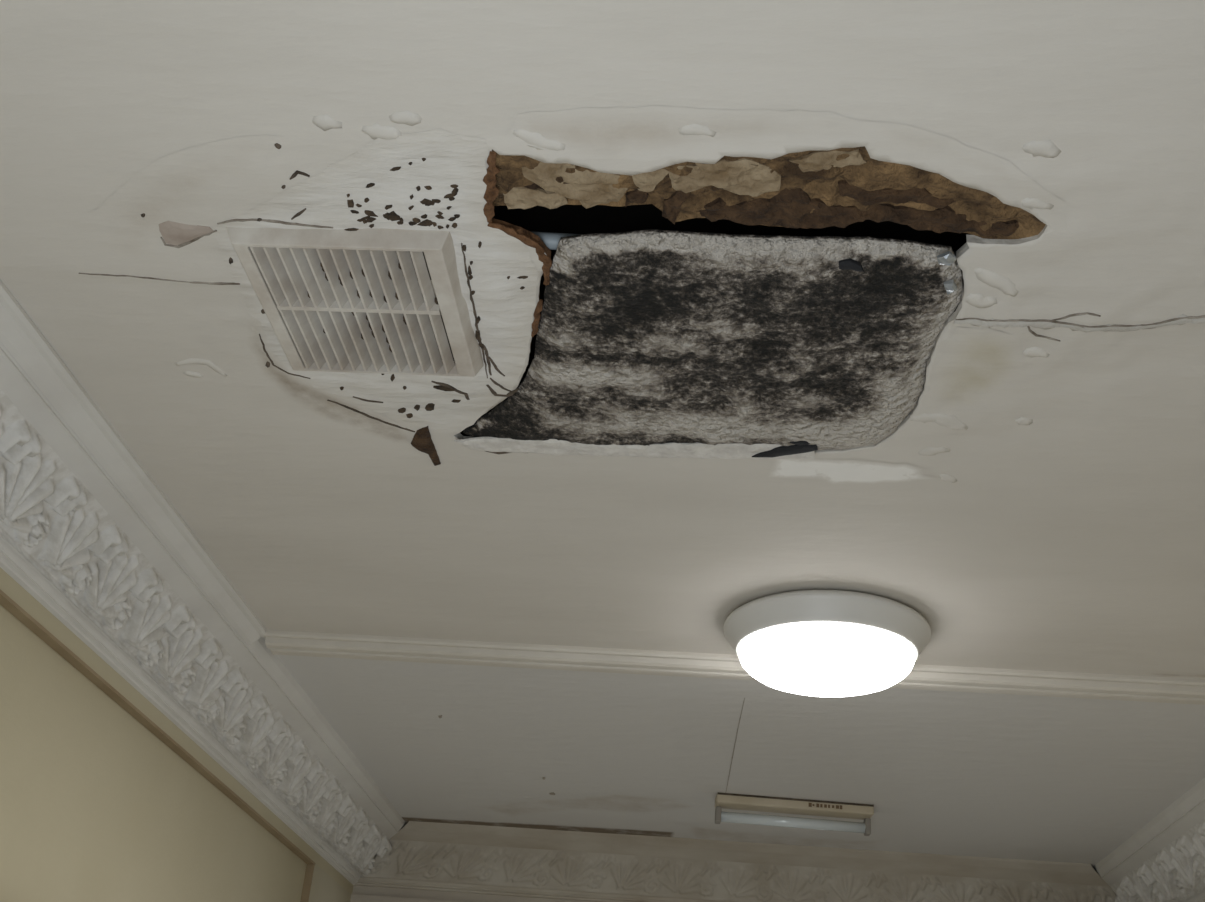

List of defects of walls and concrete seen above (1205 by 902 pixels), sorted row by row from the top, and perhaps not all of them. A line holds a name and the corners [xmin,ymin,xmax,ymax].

peeling [159,183,460,248]
flaking render [492,129,1054,239]
peeling [462,242,482,295]
crack [953,312,1205,342]
flaking render [398,385,461,466]